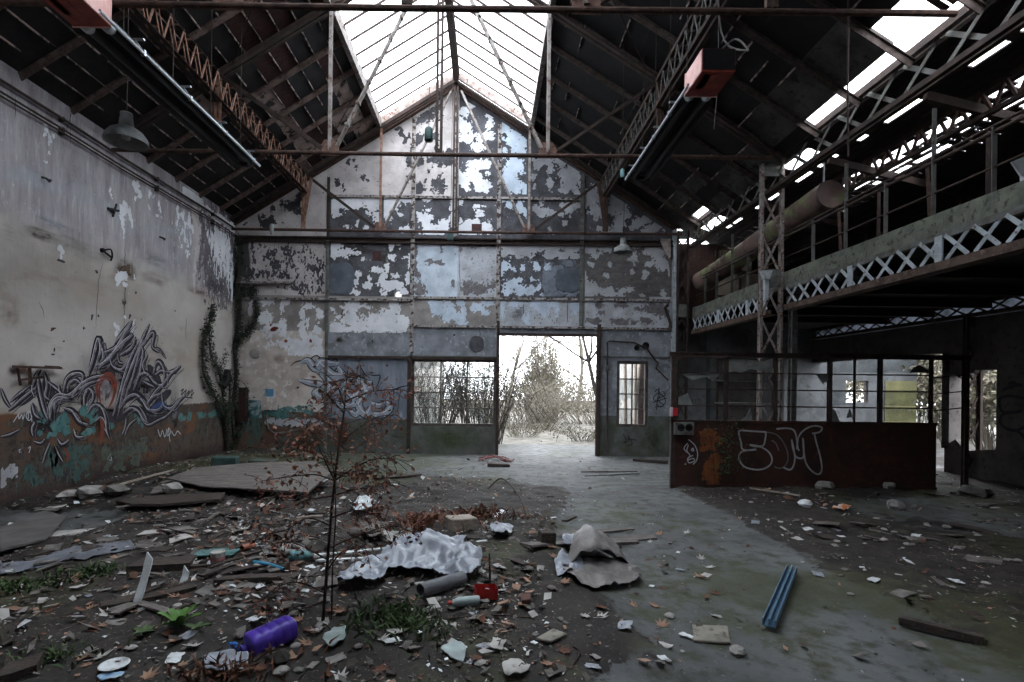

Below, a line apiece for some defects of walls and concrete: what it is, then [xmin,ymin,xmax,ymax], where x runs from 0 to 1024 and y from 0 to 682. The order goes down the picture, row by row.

peeling [109,102,670,356]
rust [698,428,725,484]